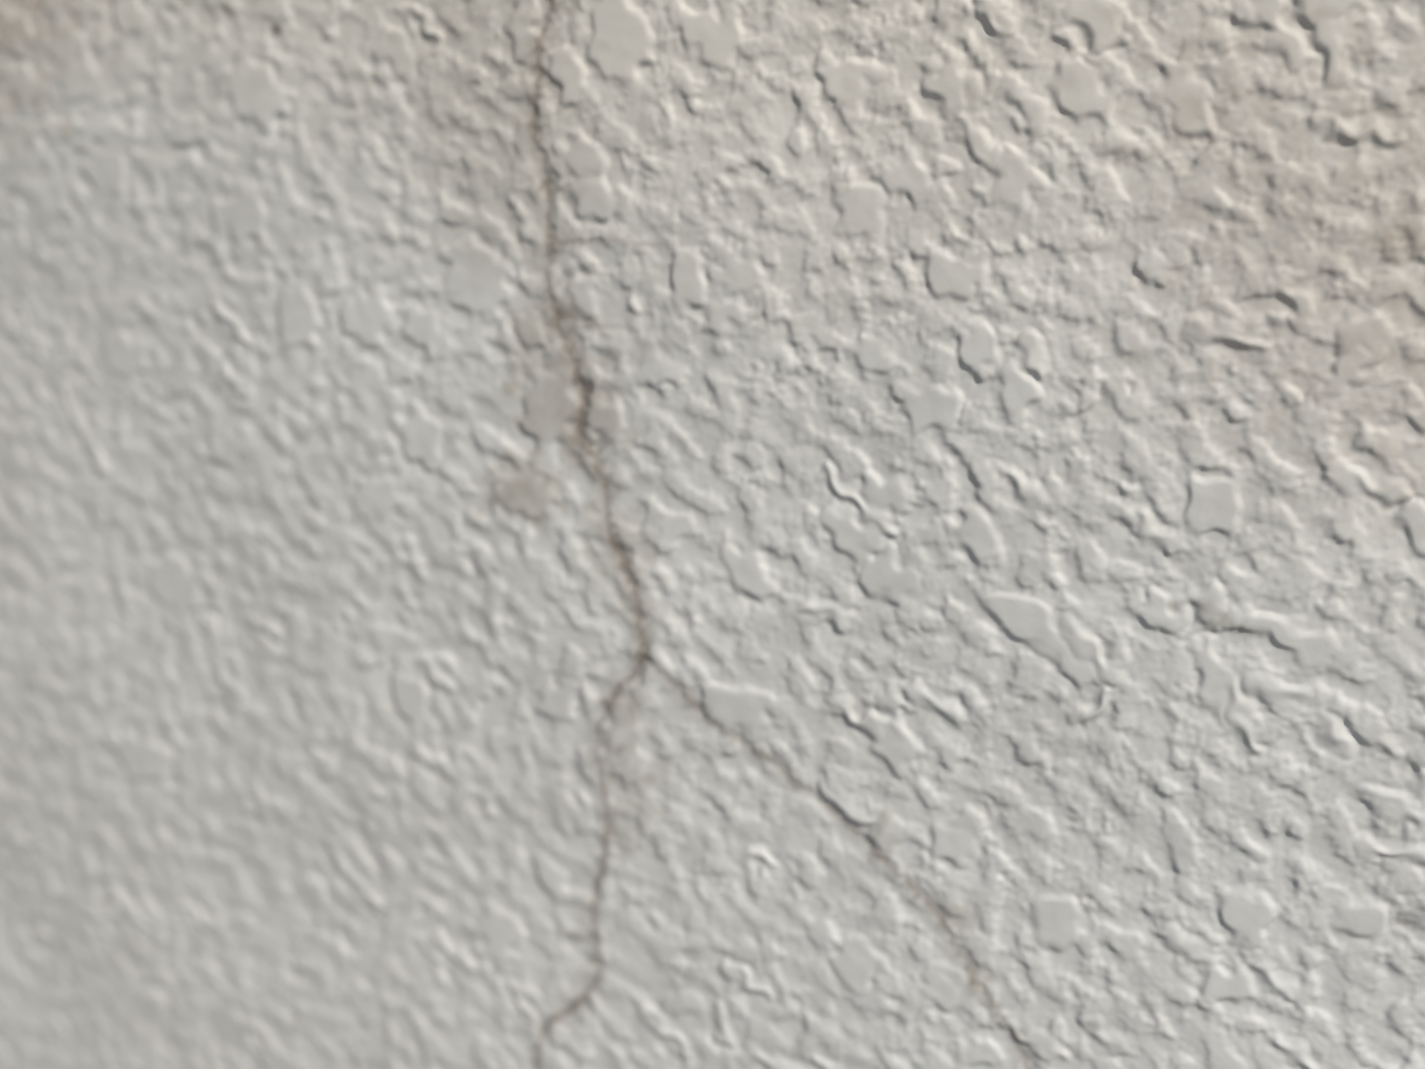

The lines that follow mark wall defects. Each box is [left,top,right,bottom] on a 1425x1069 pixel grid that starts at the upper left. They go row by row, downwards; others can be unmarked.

crack [531,34,543,138]
crack [574,361,602,465]
crack [608,529,636,597]